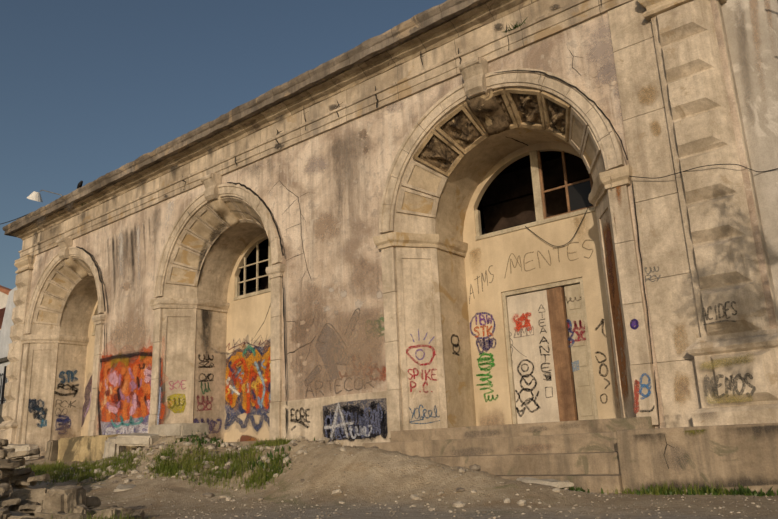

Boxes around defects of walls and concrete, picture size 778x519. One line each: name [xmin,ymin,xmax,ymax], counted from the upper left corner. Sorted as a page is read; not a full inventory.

crack [495,49,628,160]
water stain [112,223,150,265]
crack [227,157,315,433]
rust [603,218,628,405]
crack [632,182,676,469]